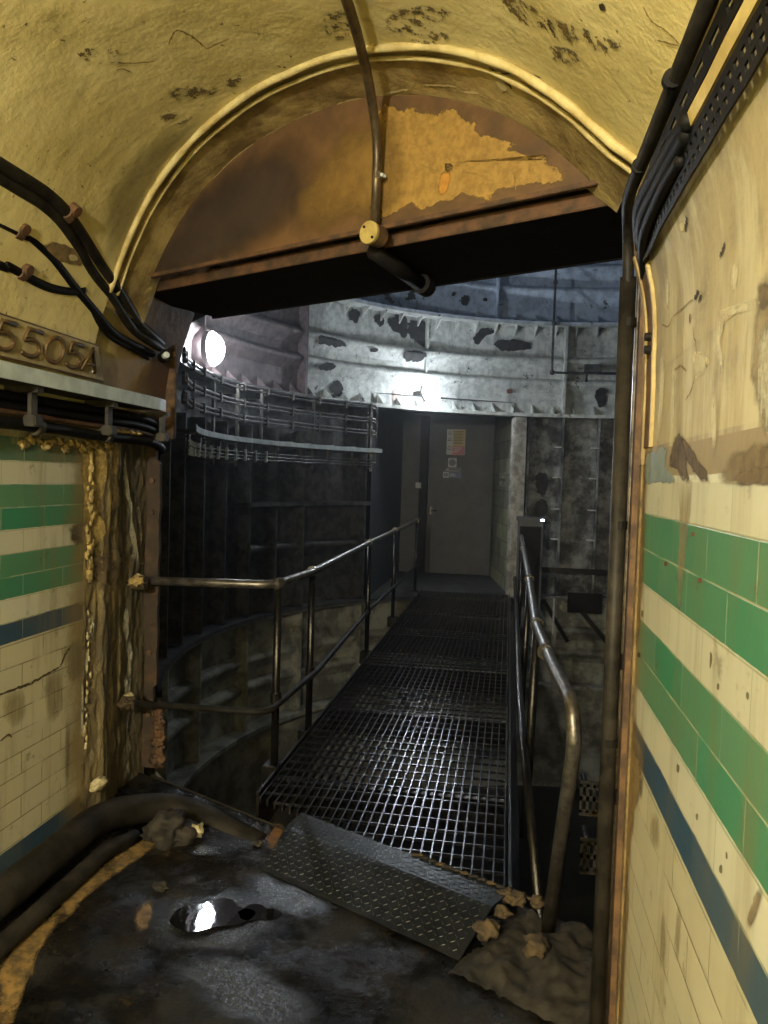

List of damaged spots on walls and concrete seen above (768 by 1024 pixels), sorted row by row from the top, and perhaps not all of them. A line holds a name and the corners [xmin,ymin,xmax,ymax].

peeling [304,89,566,226]
peeling [318,335,347,348]
peeling [348,309,360,324]
peeling [374,290,431,362]
peeling [473,328,531,352]
peeling [319,362,344,397]
peeling [595,388,607,408]
peeling [645,445,675,484]
crack [0,646,71,695]
spalling [83,610,93,750]
rust [148,700,166,769]